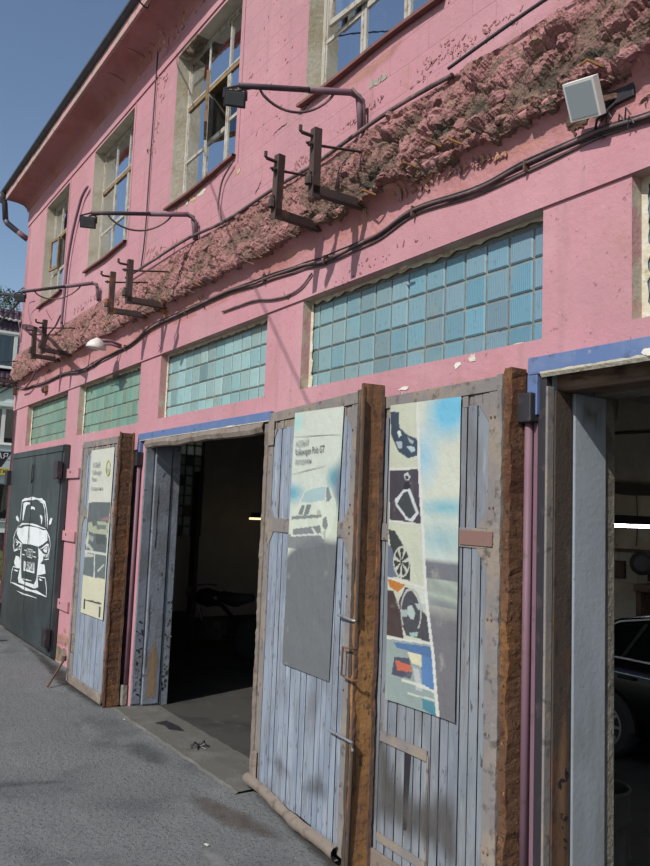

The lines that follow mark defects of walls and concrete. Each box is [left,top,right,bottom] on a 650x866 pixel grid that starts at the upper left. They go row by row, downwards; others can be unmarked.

spalling [9,0,650,385]
corrosion [102,433,133,708]
corrosion [345,383,385,866]
corrosion [496,367,527,866]